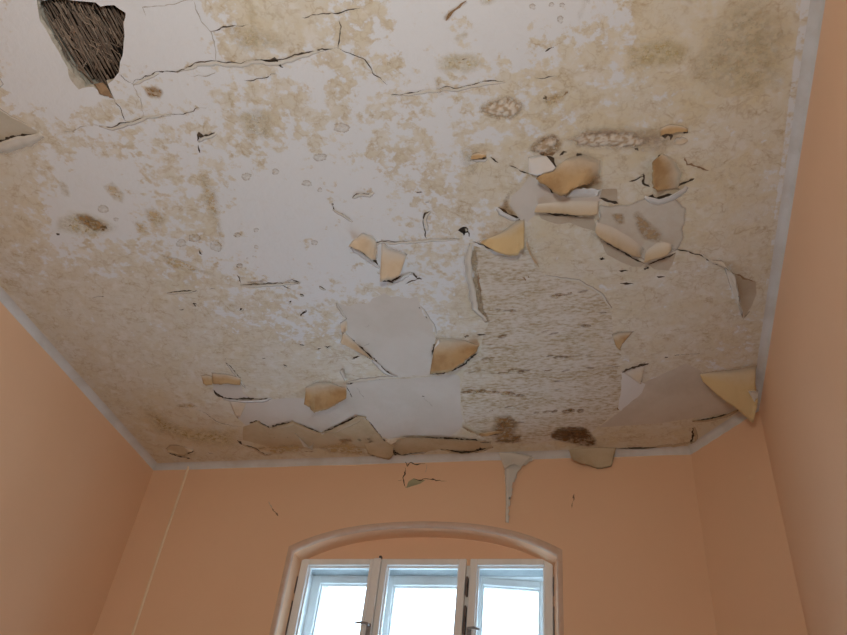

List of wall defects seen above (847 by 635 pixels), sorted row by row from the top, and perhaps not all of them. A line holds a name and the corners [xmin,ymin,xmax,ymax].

flaking render [37,0,126,99]
crack [65,0,505,132]
peeling [0,109,43,152]
peeling [471,153,498,163]
peeling [509,155,601,222]
peeling [212,240,738,469]
water stain [495,406,520,442]
water stain [552,427,595,446]